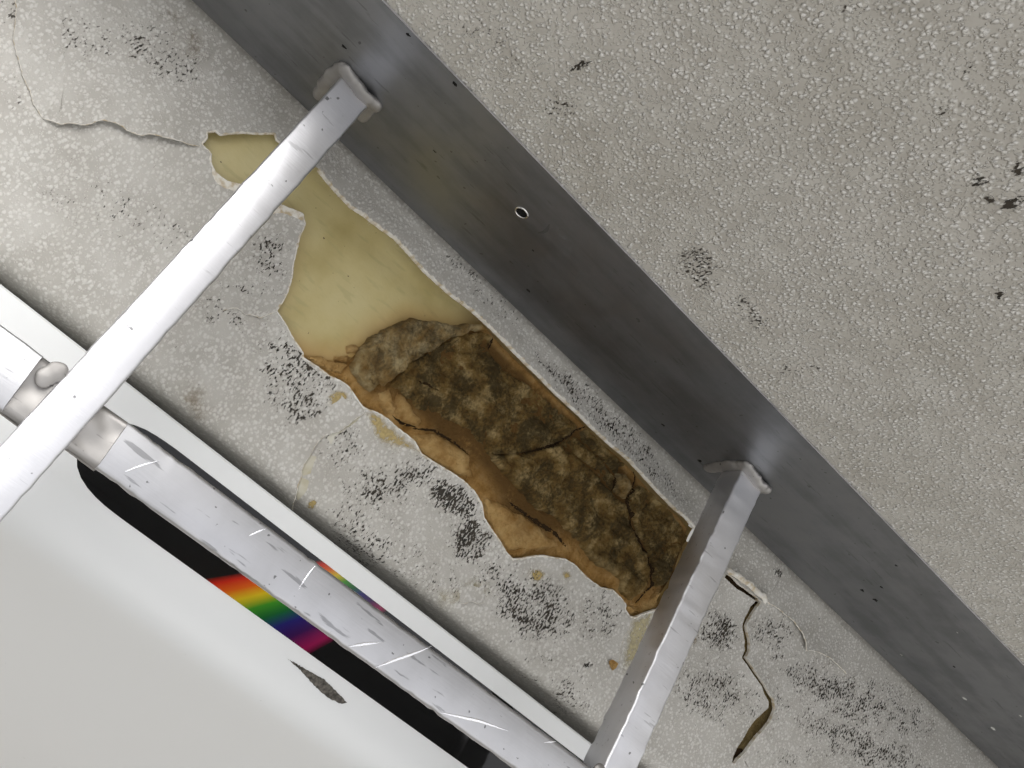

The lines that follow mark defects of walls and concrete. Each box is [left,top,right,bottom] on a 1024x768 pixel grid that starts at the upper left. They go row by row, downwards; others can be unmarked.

damp [258,331,346,425]
damp [371,415,409,447]
peeling [304,318,687,616]
damp [535,351,676,497]
damp [319,428,622,666]
damp [694,611,739,650]
damp [675,664,761,726]
crack [724,554,775,768]
damp [751,614,934,768]